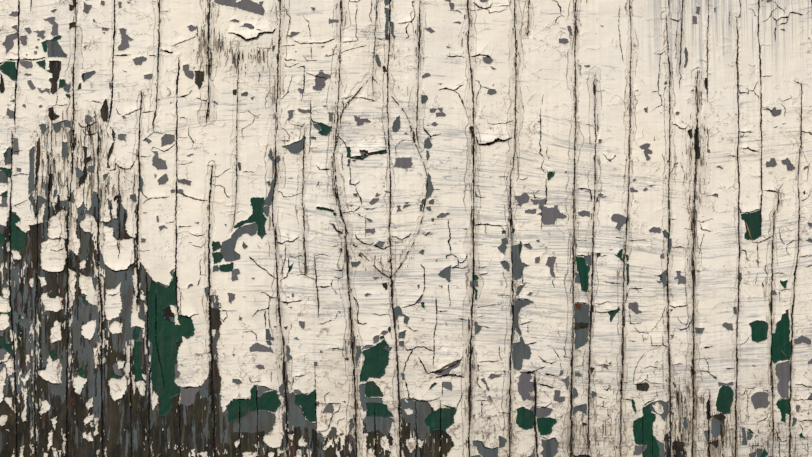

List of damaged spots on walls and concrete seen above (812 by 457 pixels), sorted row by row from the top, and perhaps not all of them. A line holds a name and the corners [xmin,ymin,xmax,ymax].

peeling [0,134,207,457]
crack [9,0,449,457]
peeling [234,406,307,457]
peeling [212,105,334,281]
peeling [335,137,412,279]
peeling [323,424,424,457]
peeling [462,216,611,457]
peeling [514,193,567,225]
peeling [574,246,642,350]
crack [439,0,805,457]
peeling [691,365,734,448]
peeling [739,202,771,243]